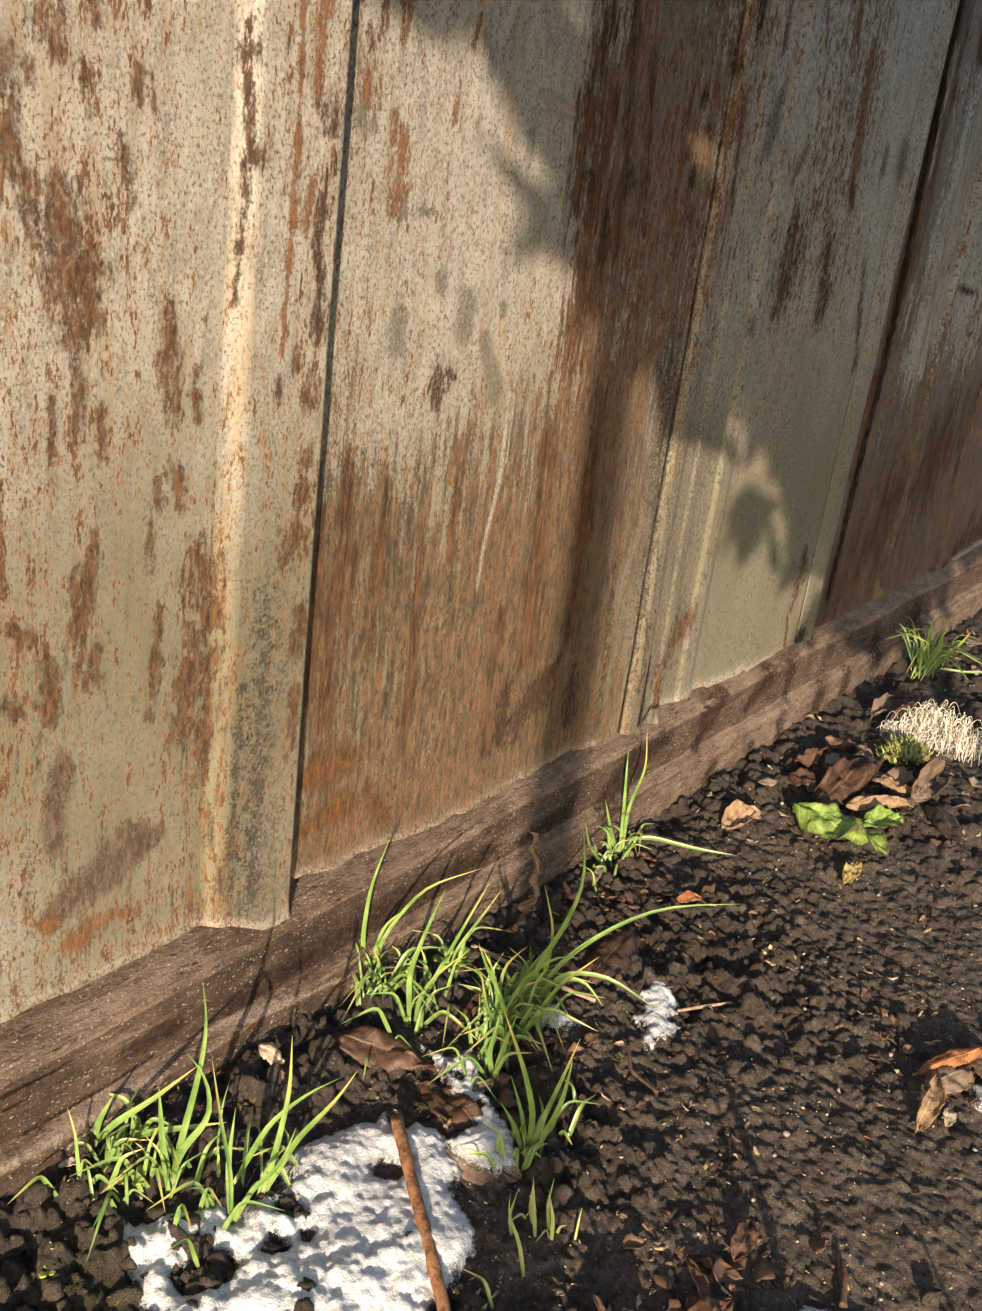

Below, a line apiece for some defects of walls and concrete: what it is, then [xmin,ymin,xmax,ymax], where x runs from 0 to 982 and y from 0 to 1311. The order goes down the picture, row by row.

corrosion [0,0,114,467]
corrosion [113,129,137,214]
corrosion [130,60,157,111]
corrosion [155,293,203,438]
corrosion [232,15,266,307]
corrosion [279,0,340,358]
corrosion [357,0,415,231]
corrosion [556,0,659,380]
corrosion [764,0,877,340]
corrosion [2,529,108,746]
corrosion [143,531,237,791]
corrosion [474,381,609,760]